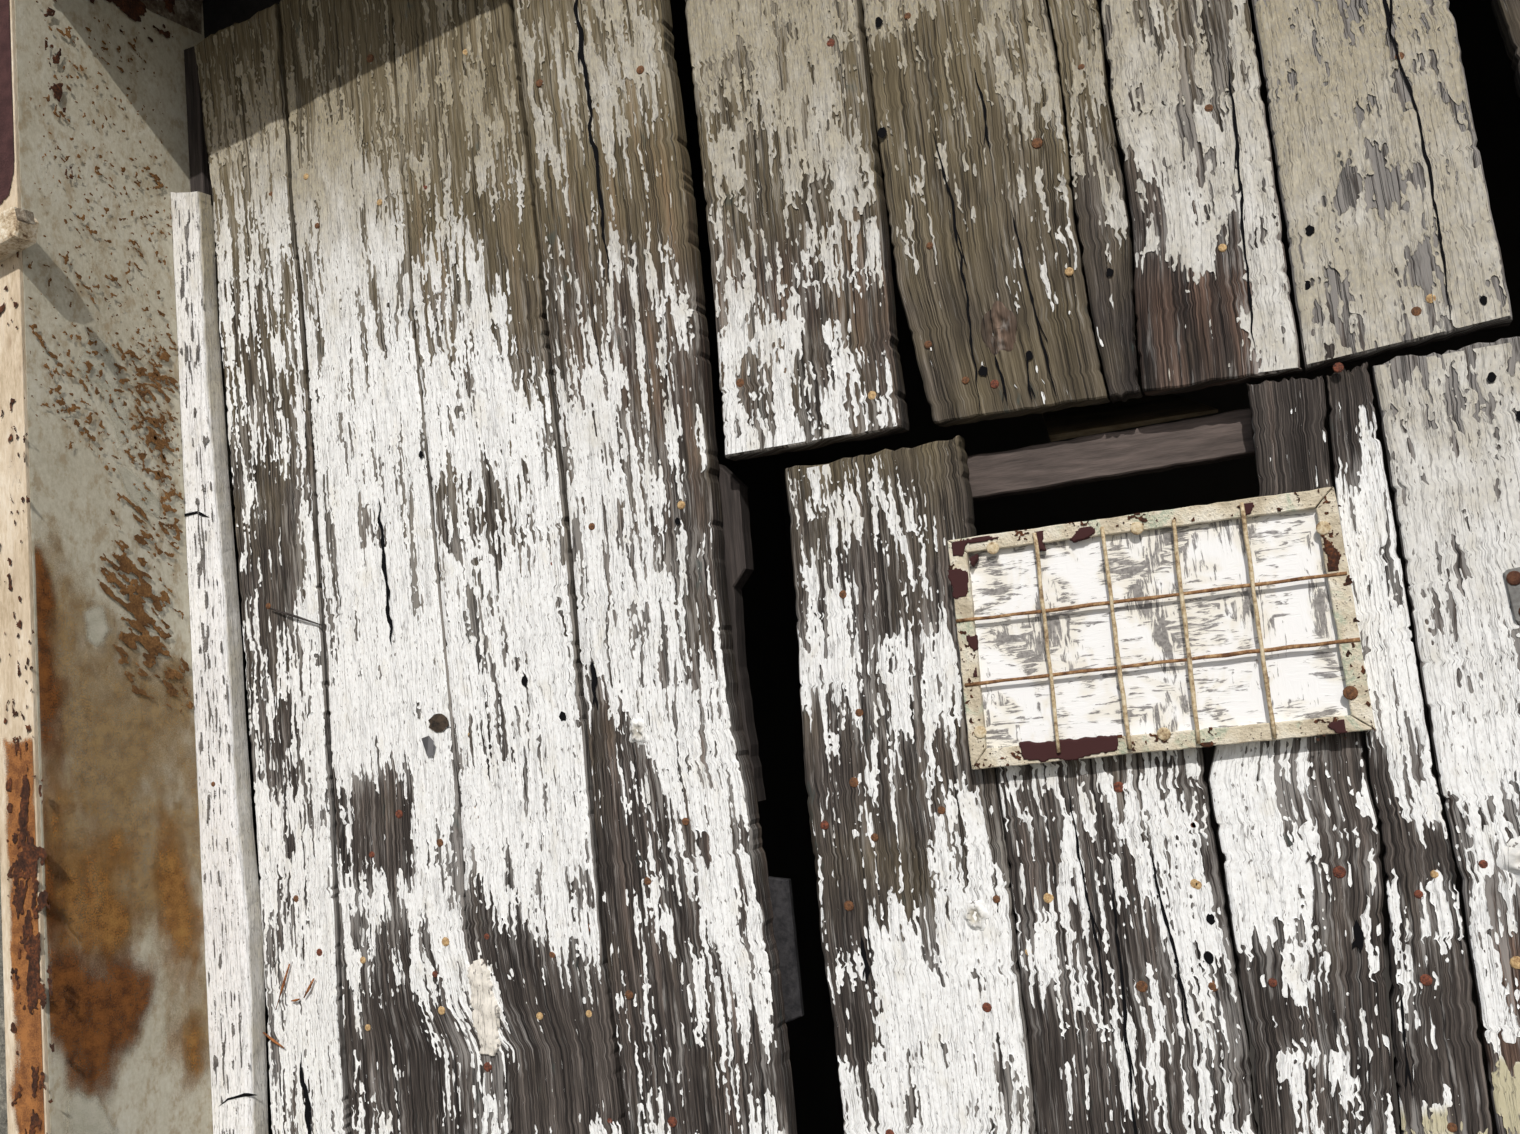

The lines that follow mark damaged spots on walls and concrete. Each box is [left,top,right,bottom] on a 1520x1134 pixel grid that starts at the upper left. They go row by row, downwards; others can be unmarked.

crack [1383,0,1451,323]
corrosion [0,0,209,1134]
peeling [194,0,785,1134]
corrosion [947,529,1047,599]
corrosion [1070,523,1098,543]
peeling [687,0,1520,1134]
corrosion [1277,489,1353,597]
corrosion [955,622,1217,769]
corrosion [1301,717,1348,741]
corrosion [1346,643,1375,731]